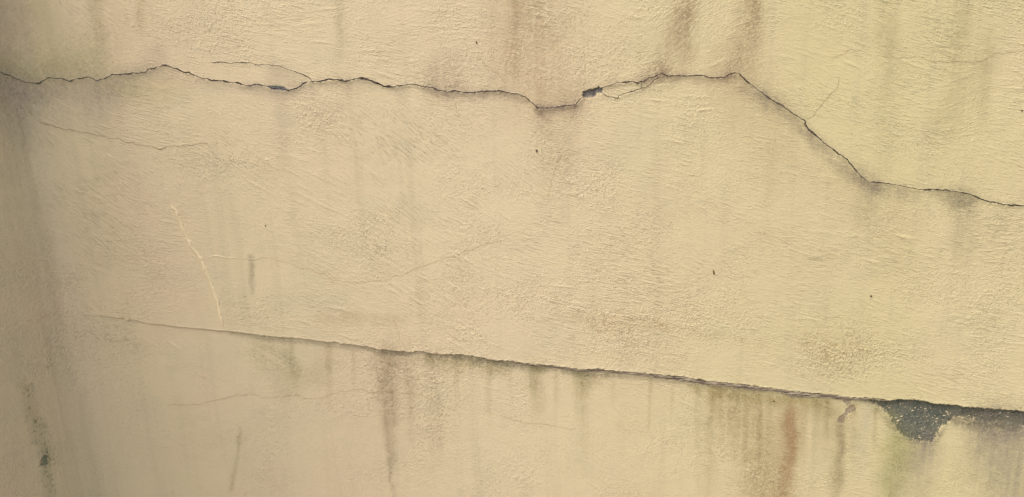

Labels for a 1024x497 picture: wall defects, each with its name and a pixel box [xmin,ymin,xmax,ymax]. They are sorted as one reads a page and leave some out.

crack [1,49,1024,206]
spalling [873,399,1024,442]